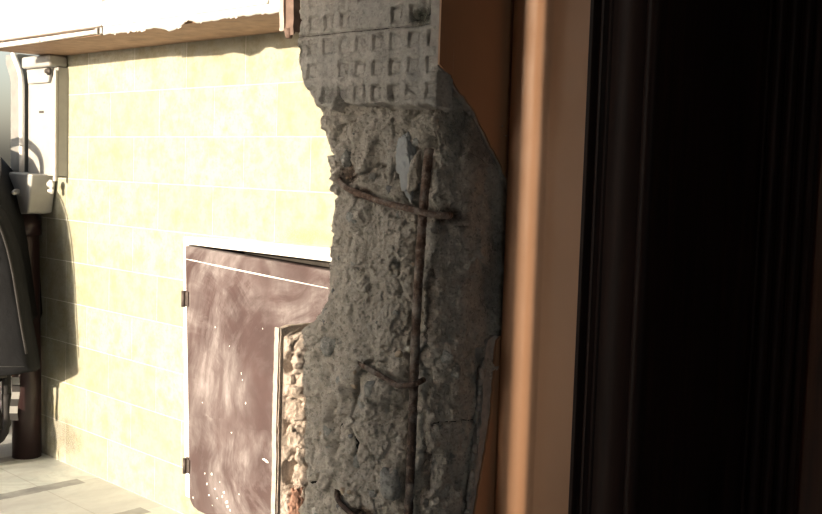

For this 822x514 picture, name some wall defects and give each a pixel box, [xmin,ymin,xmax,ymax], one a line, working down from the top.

corrosion [339,165,371,198]
spalling [298,96,507,514]